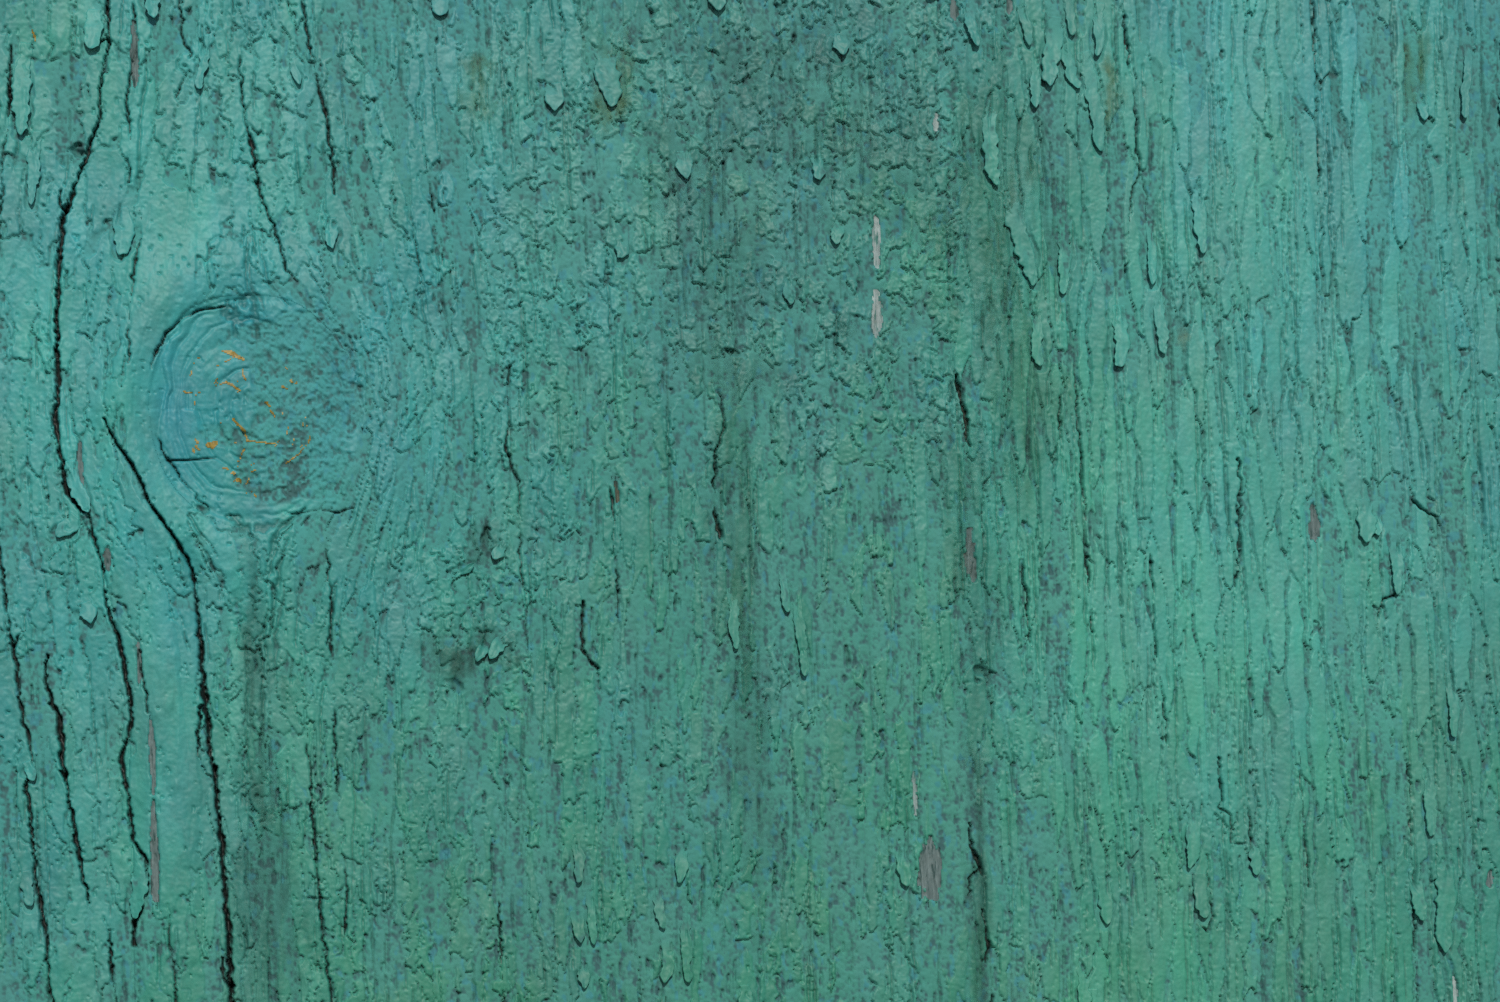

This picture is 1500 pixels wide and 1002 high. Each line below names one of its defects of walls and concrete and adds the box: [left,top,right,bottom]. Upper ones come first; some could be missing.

crack [6,75,14,106]
crack [248,139,259,186]
crack [318,91,336,179]
peeling [872,215,881,269]
crack [53,140,96,541]
peeling [871,289,883,338]
crack [955,383,969,443]
crack [129,427,235,1002]
crack [11,645,84,881]
crack [109,617,171,973]
crack [25,784,52,994]
peeling [895,836,942,901]